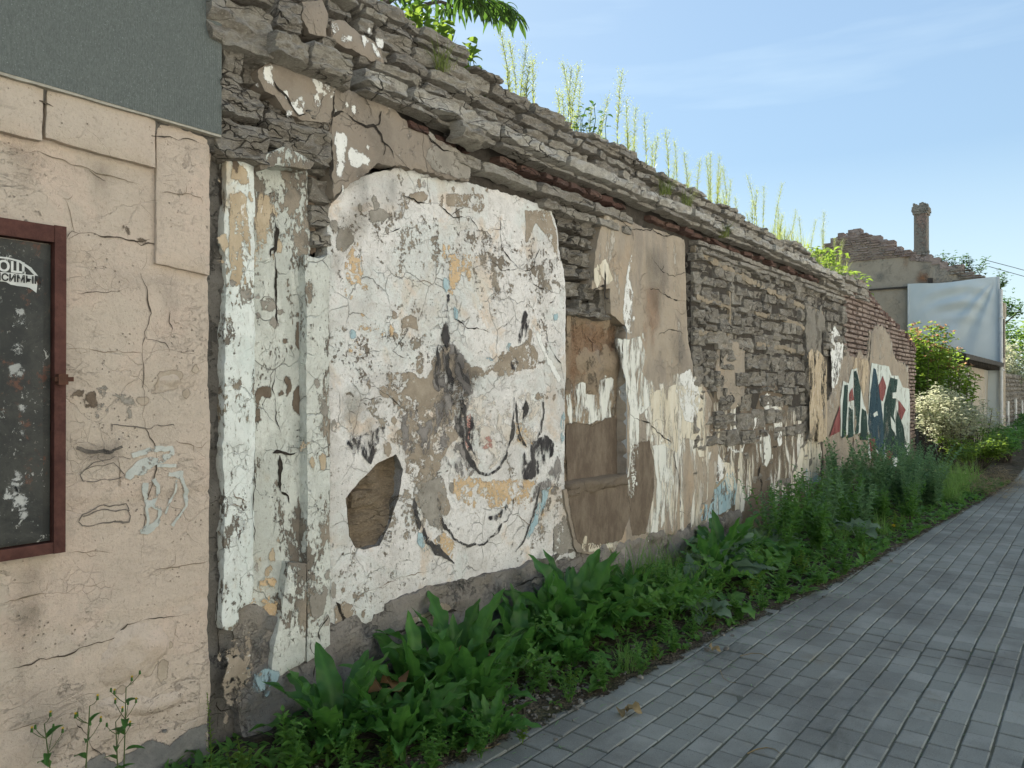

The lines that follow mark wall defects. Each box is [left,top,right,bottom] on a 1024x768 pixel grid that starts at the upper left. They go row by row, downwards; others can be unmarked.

crack [11,146,134,183]
crack [152,135,222,206]
flaking render [405,132,488,213]
peeling [217,161,299,350]
peeling [330,217,368,299]
crack [404,195,558,301]
crack [63,197,207,573]
flaking render [255,376,300,422]
flaking render [333,255,868,571]
crack [0,581,103,604]
crack [15,614,186,668]
flaking render [217,624,279,724]